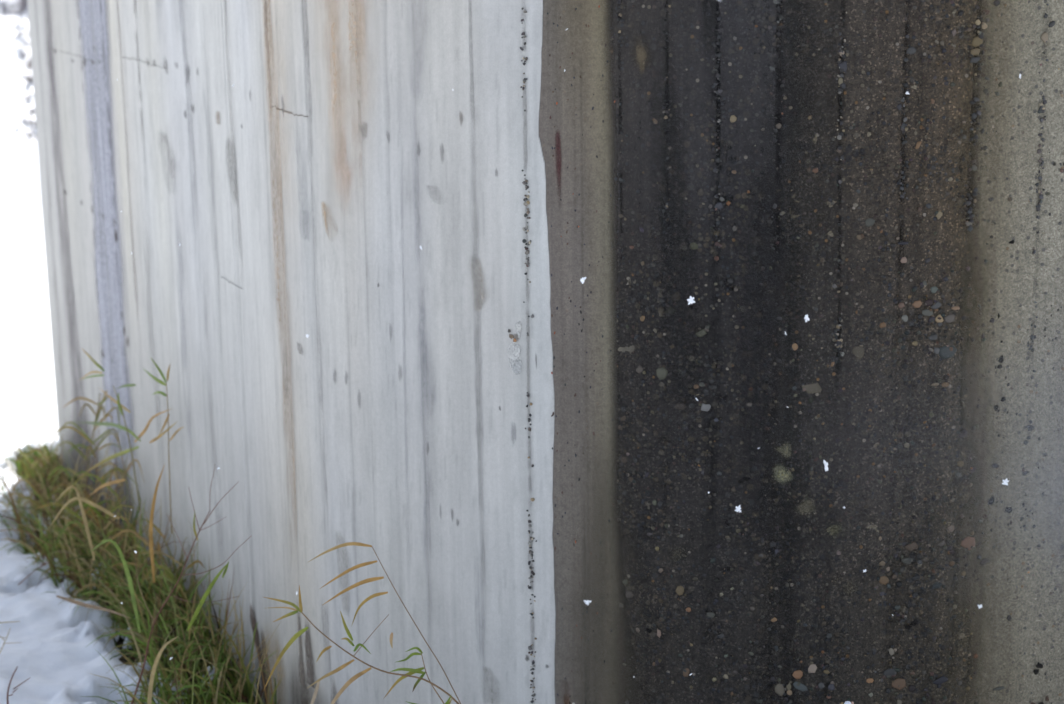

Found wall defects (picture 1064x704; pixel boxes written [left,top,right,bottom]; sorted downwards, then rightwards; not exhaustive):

damp [539,0,985,704]